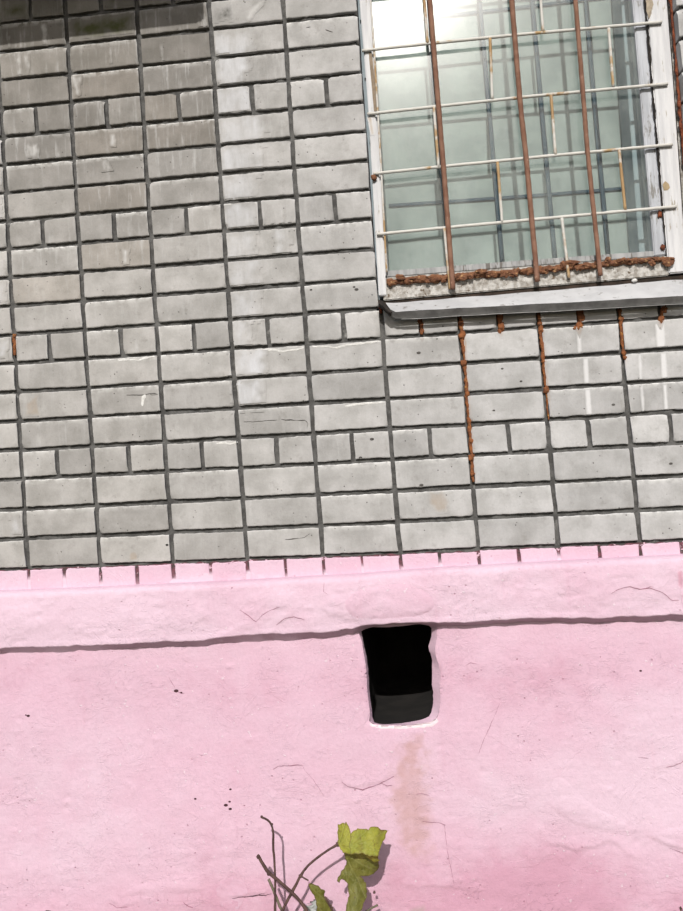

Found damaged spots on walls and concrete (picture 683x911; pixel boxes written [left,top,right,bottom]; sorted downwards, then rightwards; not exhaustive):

rust [497,314,505,338]
rust [573,310,585,339]
rust [617,308,629,367]
rust [537,312,553,424]
rust [456,317,477,483]